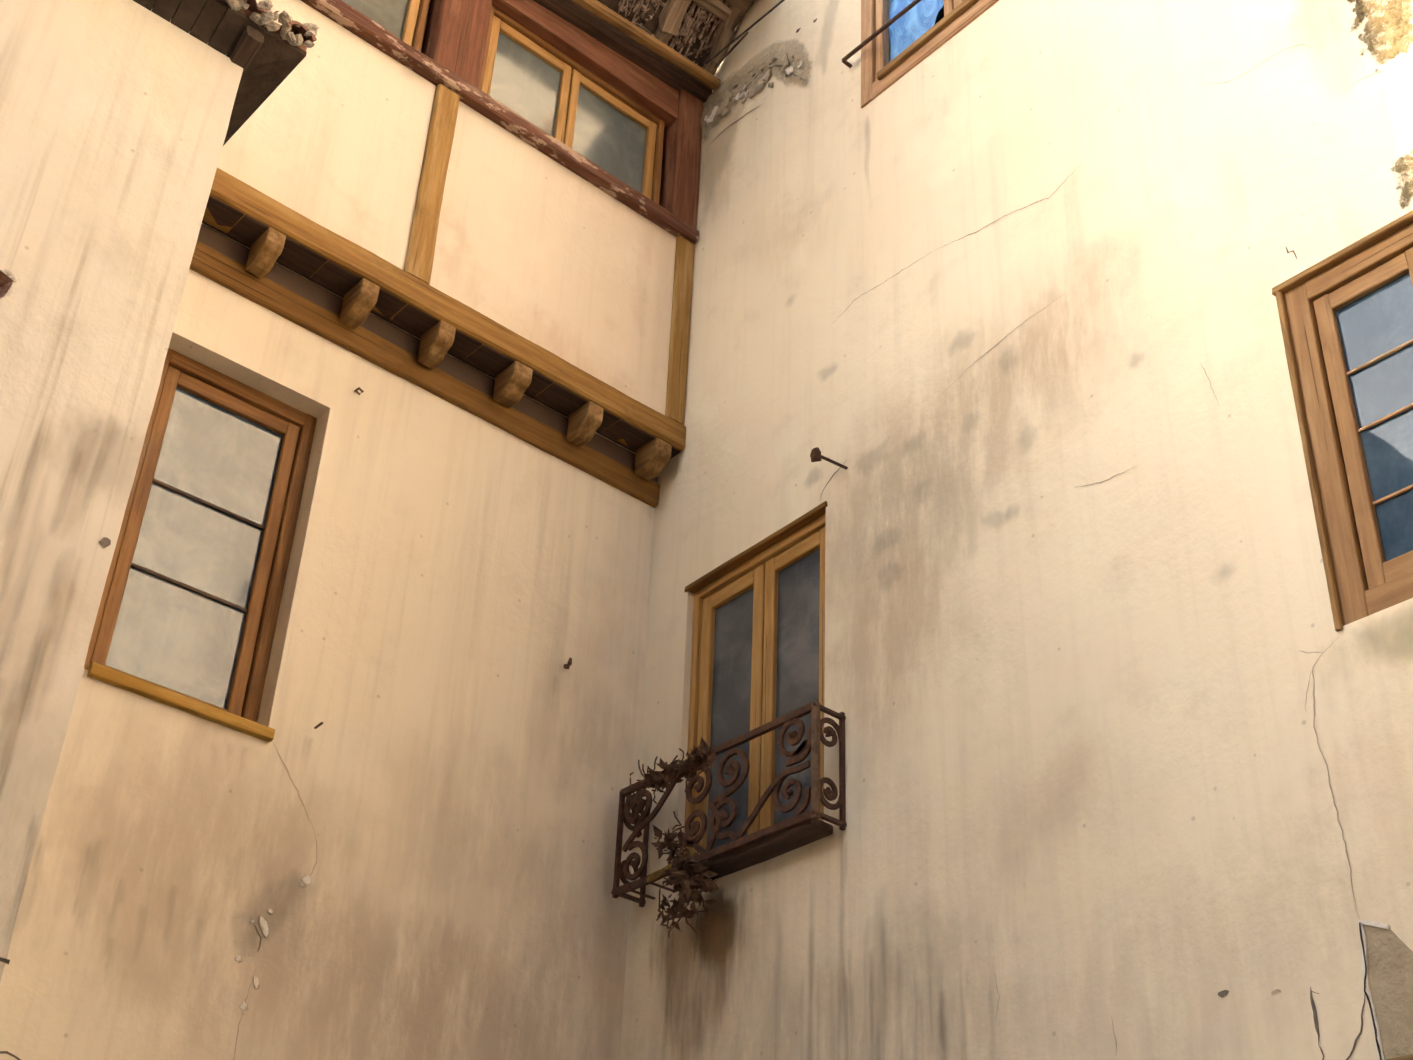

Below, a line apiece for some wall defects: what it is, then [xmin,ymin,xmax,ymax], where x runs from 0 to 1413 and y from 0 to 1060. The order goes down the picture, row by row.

spalling [700,52,806,139]
crack [273,743,318,886]
crack [1298,637,1360,918]
crack [0,957,10,965]
crack [0,1051,21,1060]
crack [233,980,253,1060]
spalling [1358,920,1413,1060]